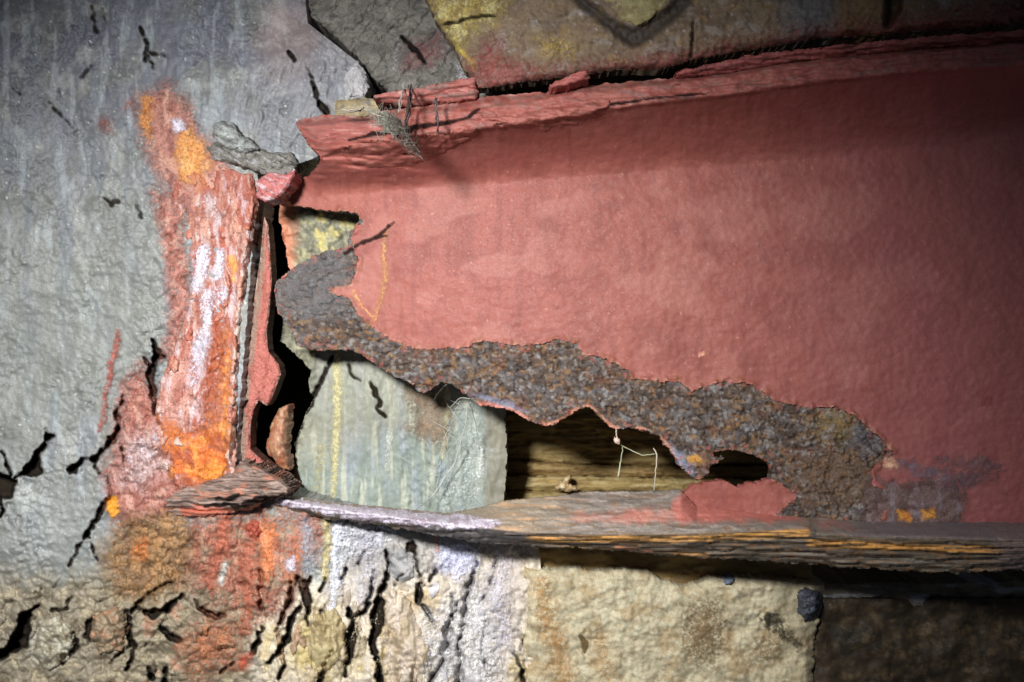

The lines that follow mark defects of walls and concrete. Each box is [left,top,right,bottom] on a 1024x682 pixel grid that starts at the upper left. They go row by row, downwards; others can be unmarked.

corrosion [125,79,230,361]
crack [143,338,166,412]
corrosion [274,211,1001,523]
crack [66,395,125,567]
corrosion [97,288,334,677]
crack [220,549,496,682]
crack [512,641,525,682]